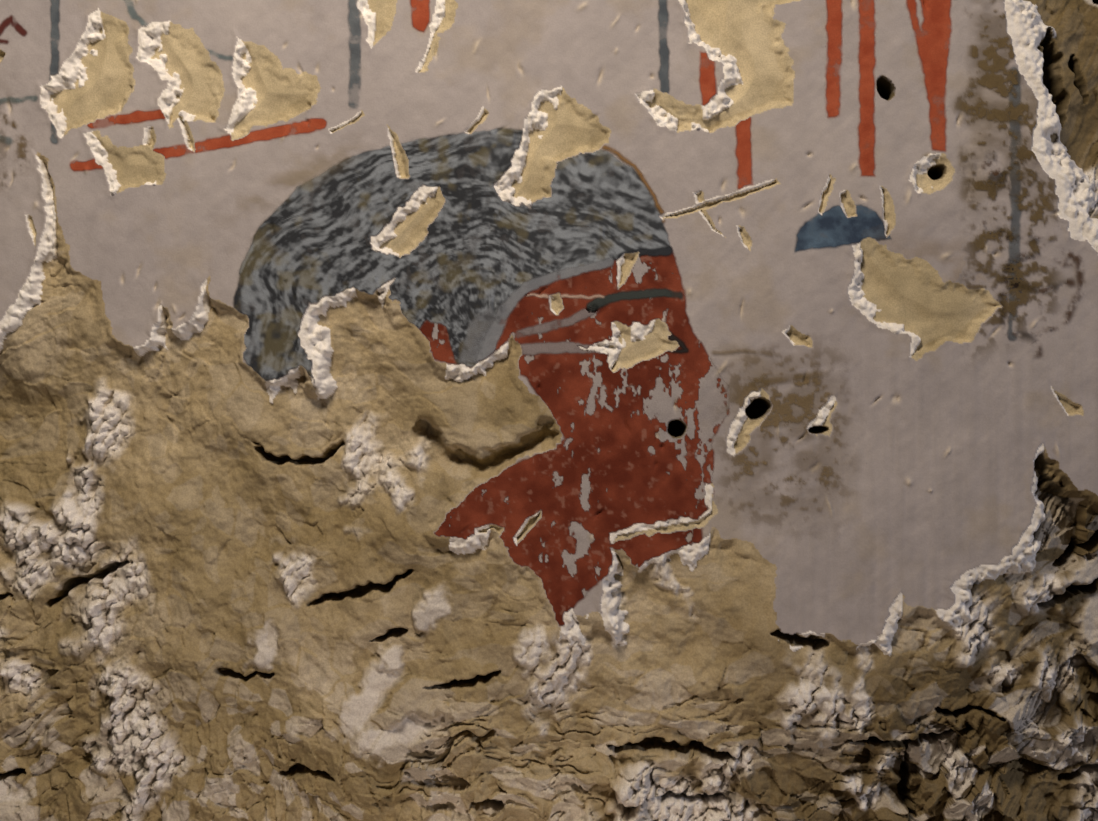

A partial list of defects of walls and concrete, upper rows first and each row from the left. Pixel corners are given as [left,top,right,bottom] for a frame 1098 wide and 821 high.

flaking render [41,9,322,196]
flaking render [494,86,612,207]
flaking render [635,0,801,134]
flaking render [1004,0,1098,253]
flaking render [848,187,1003,362]
flaking render [0,152,564,728]
crack [256,441,345,467]
peeling [578,309,729,544]
crack [0,593,13,602]
crack [46,560,133,609]
crack [308,569,414,607]
flaking render [0,444,1098,821]